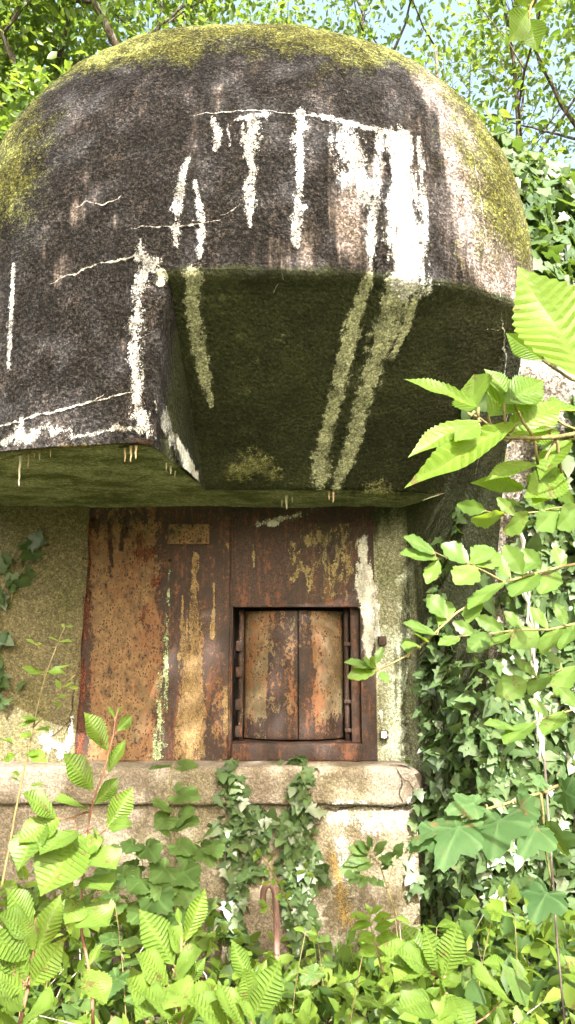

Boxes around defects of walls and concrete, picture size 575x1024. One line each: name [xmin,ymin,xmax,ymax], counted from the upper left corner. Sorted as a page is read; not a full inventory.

efflorescence [7,263,15,372]
crack [51,254,164,284]
efflorescence [107,241,168,438]
crack [134,205,239,229]
efflorescence [170,157,214,408]
efflorescence [210,111,269,228]
efflorescence [256,106,440,527]
efflorescence [0,417,86,446]
rust [80,516,157,640]
peeling [288,522,359,599]
efflorescence [355,535,380,660]
rust [76,654,91,755]